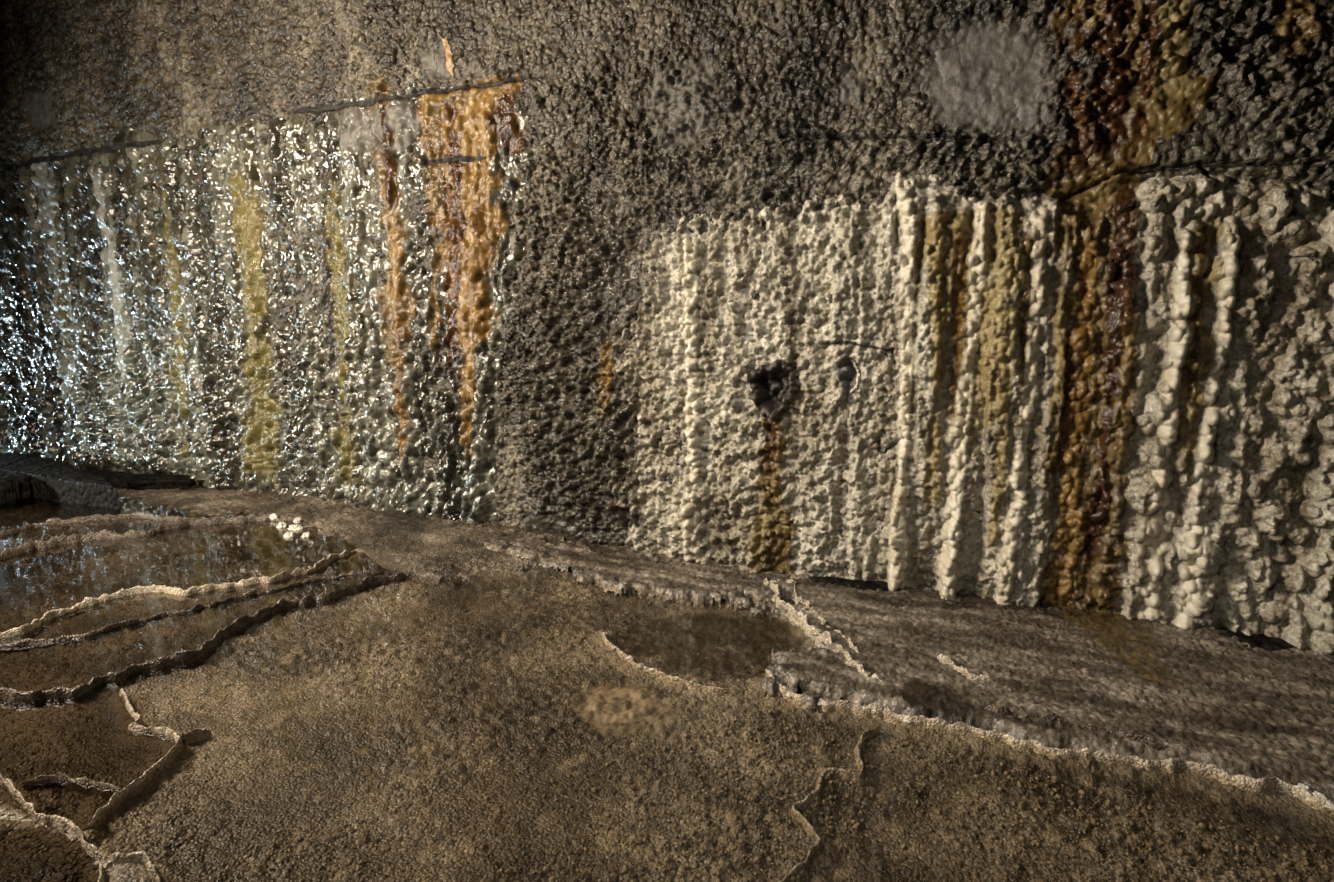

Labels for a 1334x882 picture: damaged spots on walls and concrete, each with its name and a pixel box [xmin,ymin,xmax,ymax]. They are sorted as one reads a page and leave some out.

rust [365,38,524,467]
rust [747,414,796,577]
spalling [747,359,799,423]
rust [916,208,1034,545]
rust [1040,0,1225,614]